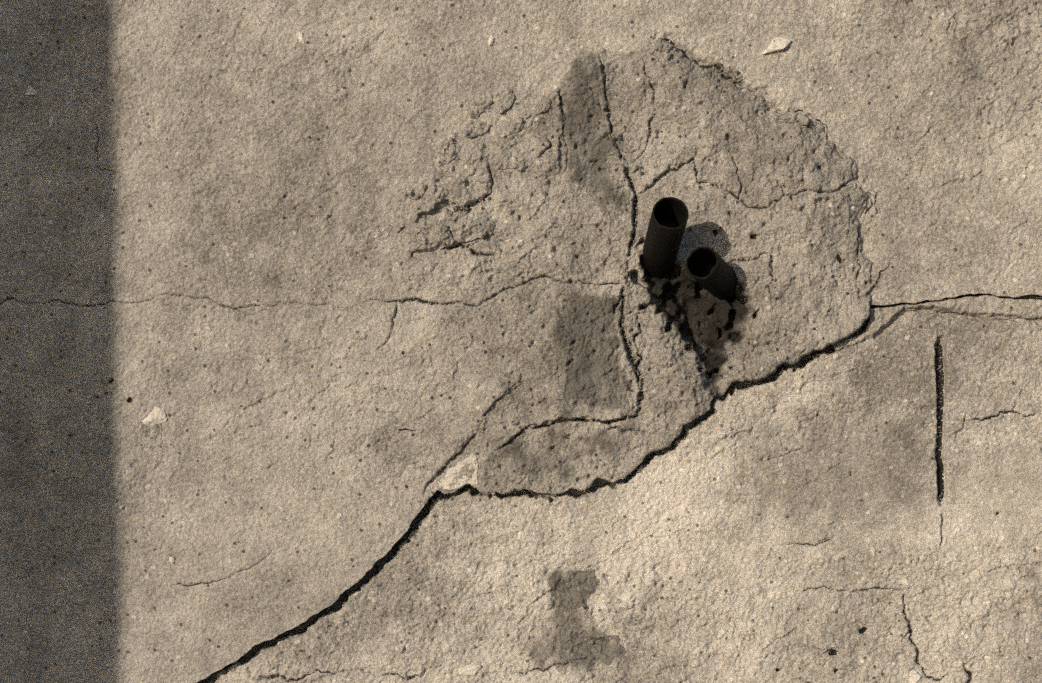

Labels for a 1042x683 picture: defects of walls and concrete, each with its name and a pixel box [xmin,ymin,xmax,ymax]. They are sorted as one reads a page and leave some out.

crack [0,38,890,449]
crack [425,378,521,489]
crack [956,400,1042,436]
crack [784,538,831,546]
crack [173,554,270,587]
crack [800,586,972,683]
crack [262,661,445,682]
crack [519,662,569,675]